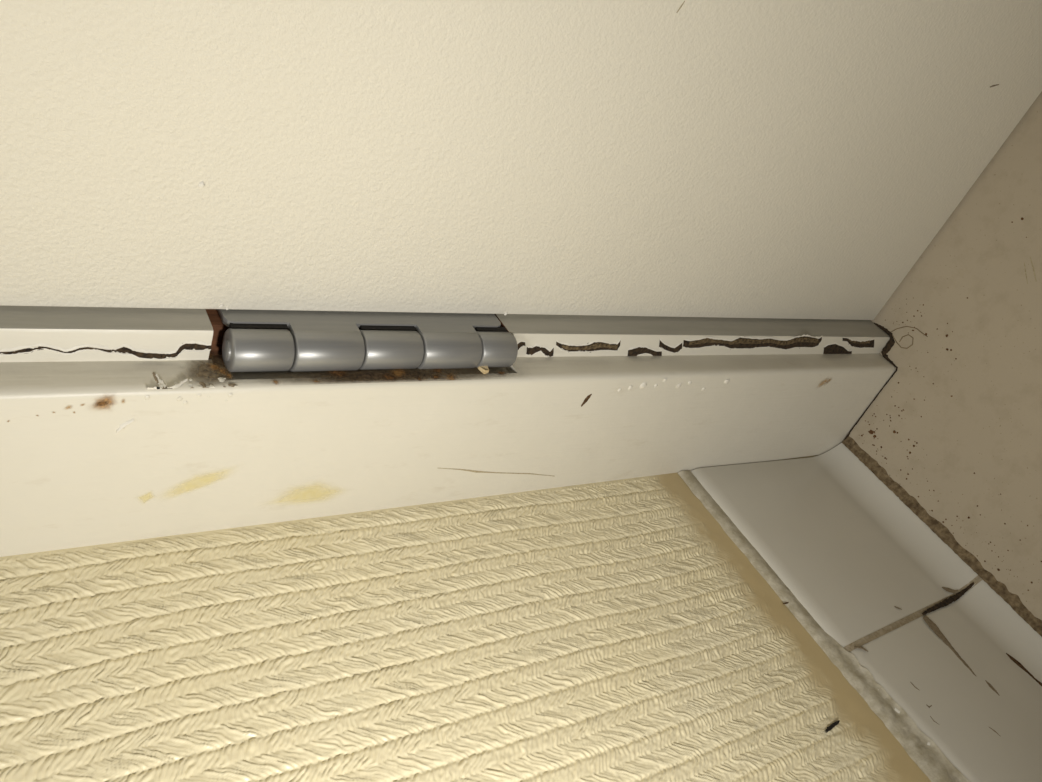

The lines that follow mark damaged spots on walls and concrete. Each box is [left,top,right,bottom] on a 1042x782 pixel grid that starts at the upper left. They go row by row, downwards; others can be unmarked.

crack [0,340,212,360]
crack [517,334,875,357]
corrosion [190,355,231,383]
corrosion [274,368,477,384]